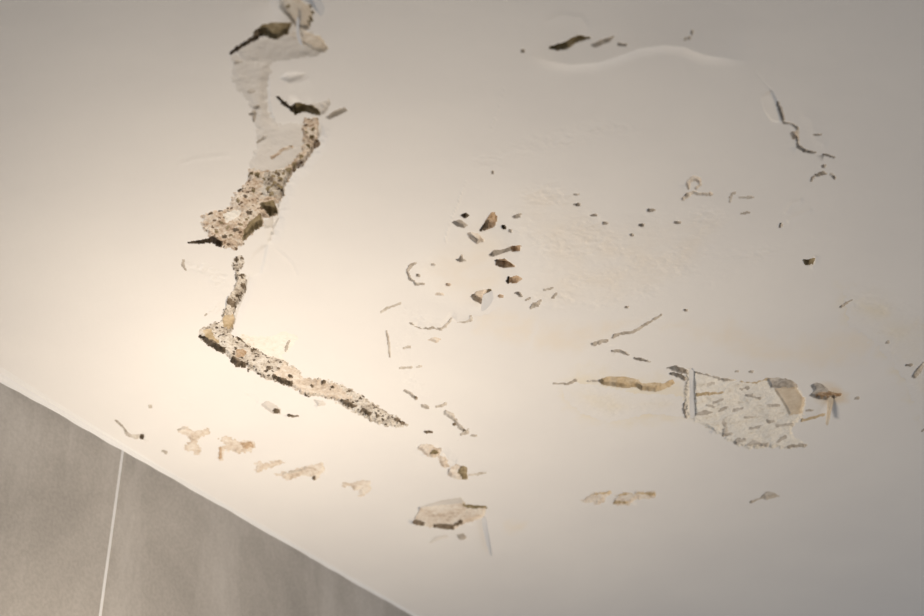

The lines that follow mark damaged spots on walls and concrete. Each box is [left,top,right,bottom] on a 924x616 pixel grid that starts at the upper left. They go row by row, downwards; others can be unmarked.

flaking render [181,0,408,428]
peeling [385,302,468,439]
flaking render [553,365,842,450]
peeling [177,426,256,461]
peeling [254,460,325,481]
flaking render [412,497,491,556]
flaking render [418,441,486,480]
peeling [581,491,656,506]